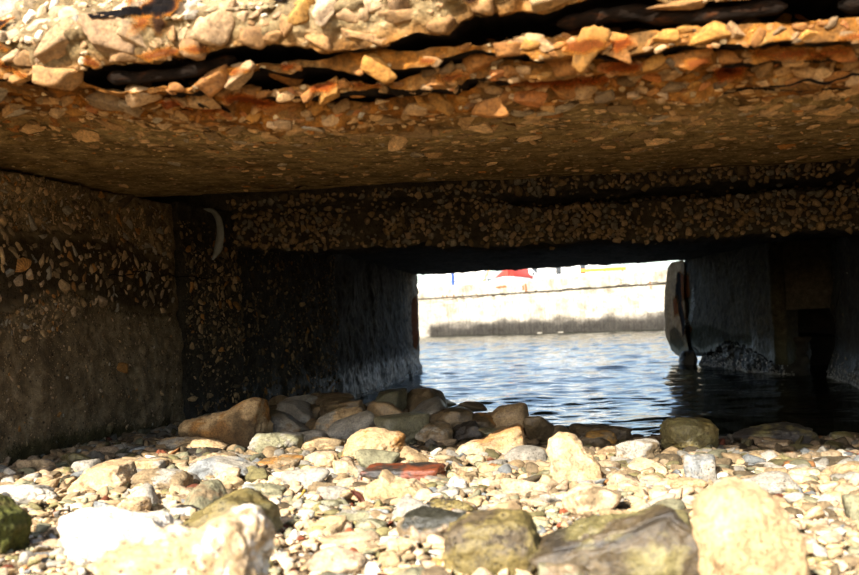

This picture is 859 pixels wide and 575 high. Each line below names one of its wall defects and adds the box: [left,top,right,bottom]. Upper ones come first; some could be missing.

corrosion [127,0,209,62]
corrosion [509,36,643,89]
spalling [403,0,859,118]
corrosion [685,56,744,82]
corrosion [752,32,859,61]
spalling [1,52,404,136]
corrosion [223,93,277,109]
corrosion [310,80,336,92]
corrosion [349,79,382,90]